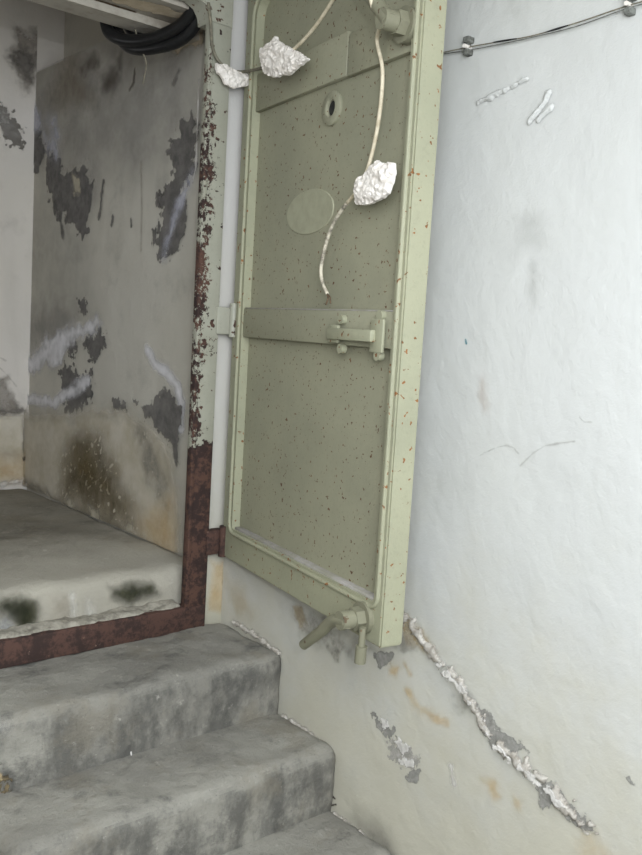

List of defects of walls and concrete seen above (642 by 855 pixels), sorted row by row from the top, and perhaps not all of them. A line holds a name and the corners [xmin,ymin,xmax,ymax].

peeling [0,102,105,240]
peeling [151,110,200,263]
peeling [58,326,107,415]
damp [0,599,35,625]
damp [114,584,154,602]
peeling [374,651,394,669]
peeling [371,712,421,783]
spalling [402,614,598,835]